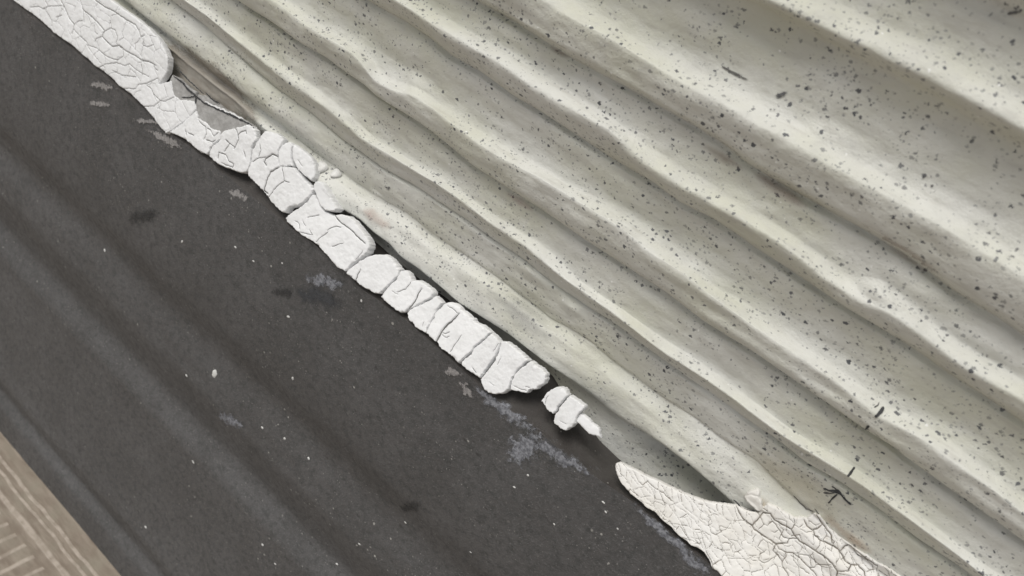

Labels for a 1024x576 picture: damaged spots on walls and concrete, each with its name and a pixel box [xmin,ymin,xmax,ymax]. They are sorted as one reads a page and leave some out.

crack [17,0,299,195]
peeling [14,0,603,438]
crack [296,215,362,281]
crack [394,282,461,352]
crack [616,463,896,576]